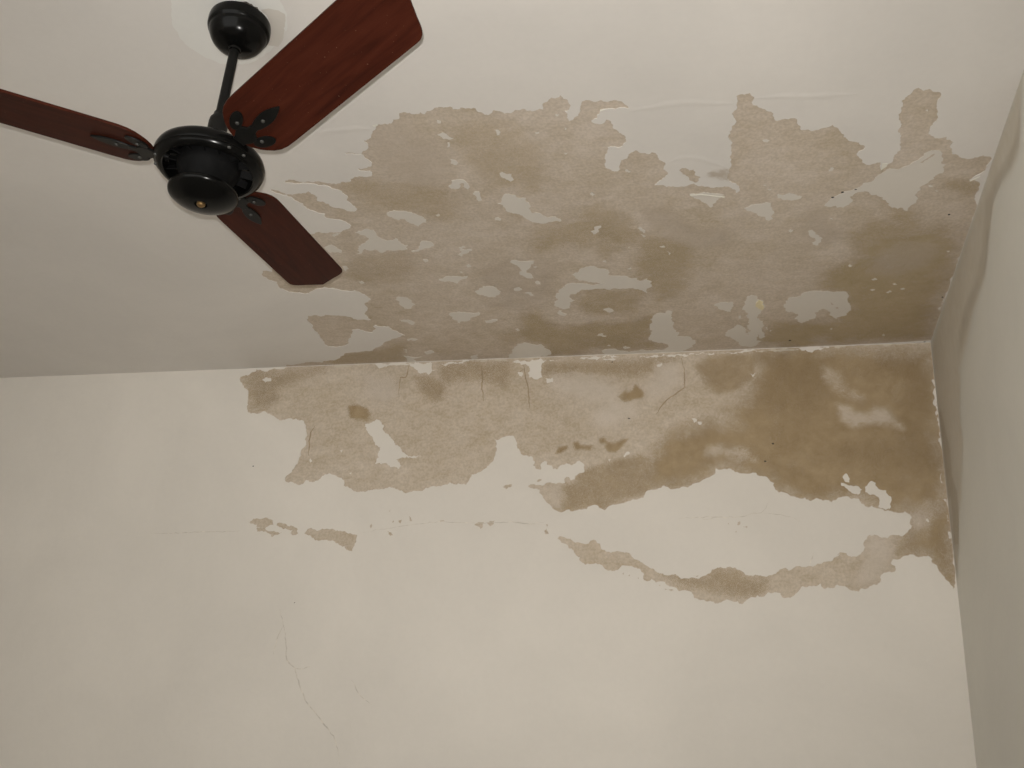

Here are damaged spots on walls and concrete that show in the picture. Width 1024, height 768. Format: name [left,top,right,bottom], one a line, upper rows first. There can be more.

leakage [245,340,411,412]
peeling [240,88,992,604]
leakage [414,77,1023,589]
leakage [347,403,372,423]
leakage [660,568,770,601]